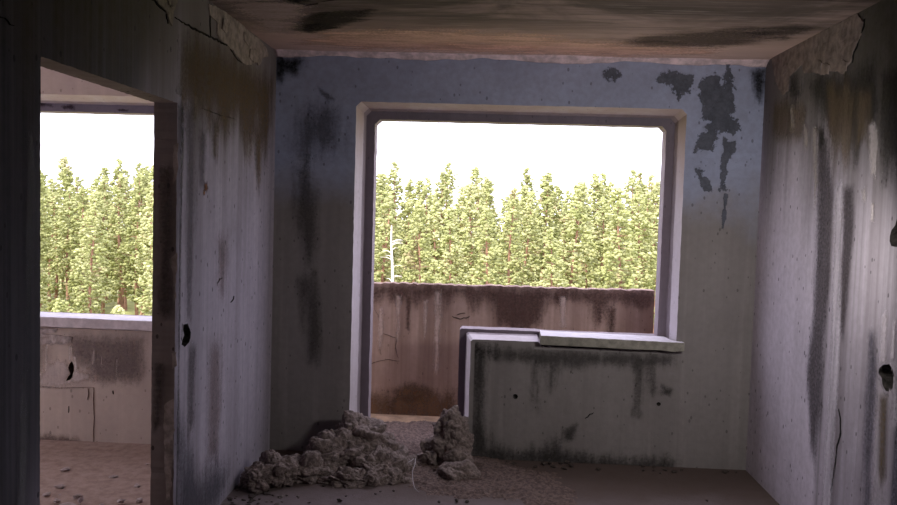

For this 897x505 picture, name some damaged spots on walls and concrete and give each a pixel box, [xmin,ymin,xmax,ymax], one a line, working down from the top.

crack [152,0,242,63]
peeling [208,4,269,66]
damp [753,69,765,100]
peeling [772,13,864,95]
damp [181,40,303,296]
peeling [656,64,741,229]
flaking render [163,106,191,505]
damp [373,285,654,371]
damp [791,66,897,505]
hole [879,364,895,392]
crack [830,409,841,499]